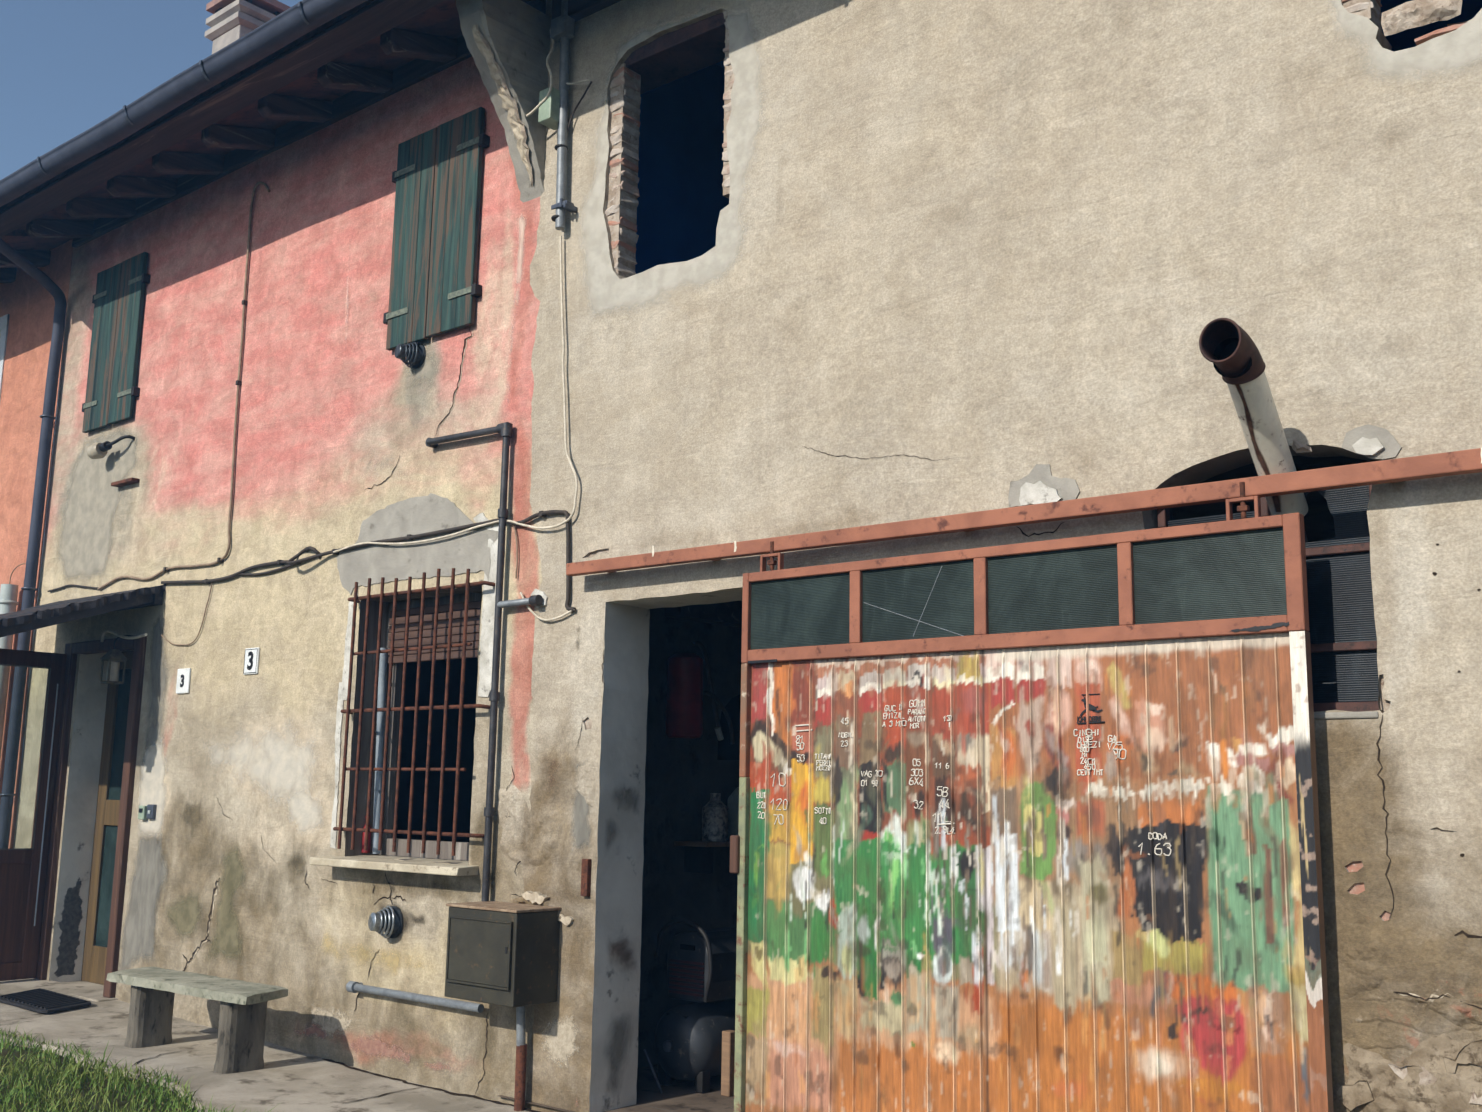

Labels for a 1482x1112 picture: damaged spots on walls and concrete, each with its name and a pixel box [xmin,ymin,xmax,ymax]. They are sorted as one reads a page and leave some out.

crack [434,326,473,438]
leakage [214,733,320,830]
leakage [290,857,304,873]
crack [1376,715,1394,919]
peeling [55,878,83,977]
crack [183,876,220,971]
spalling [1336,997,1482,1112]